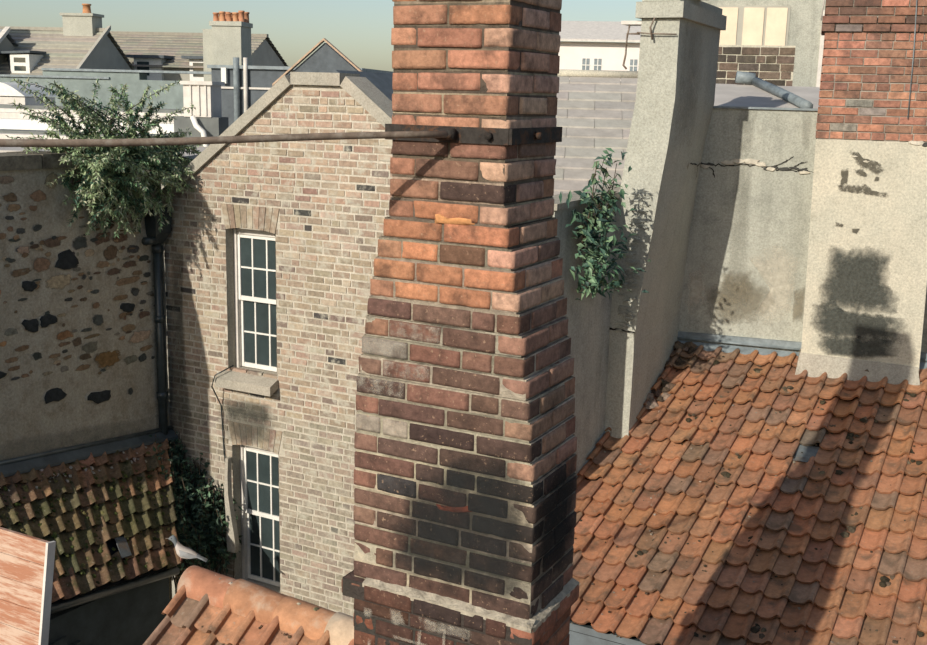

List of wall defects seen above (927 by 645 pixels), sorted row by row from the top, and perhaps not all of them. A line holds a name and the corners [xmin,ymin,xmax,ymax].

crack [690,156,814,178]
spalling [838,152,886,197]
leakage [712,260,789,319]